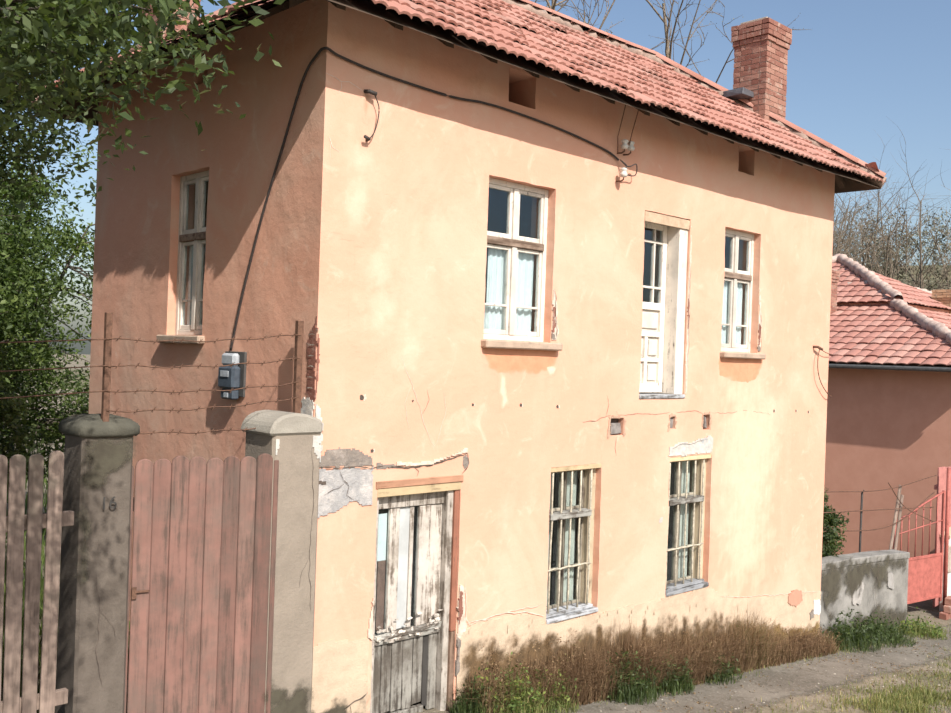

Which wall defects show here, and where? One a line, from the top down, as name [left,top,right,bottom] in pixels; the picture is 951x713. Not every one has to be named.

water stain [481,340,560,412]
water stain [717,352,763,383]
peeling [312,435,396,485]
crack [299,359,469,608]
water stain [821,556,907,620]
water stain [774,623,819,640]